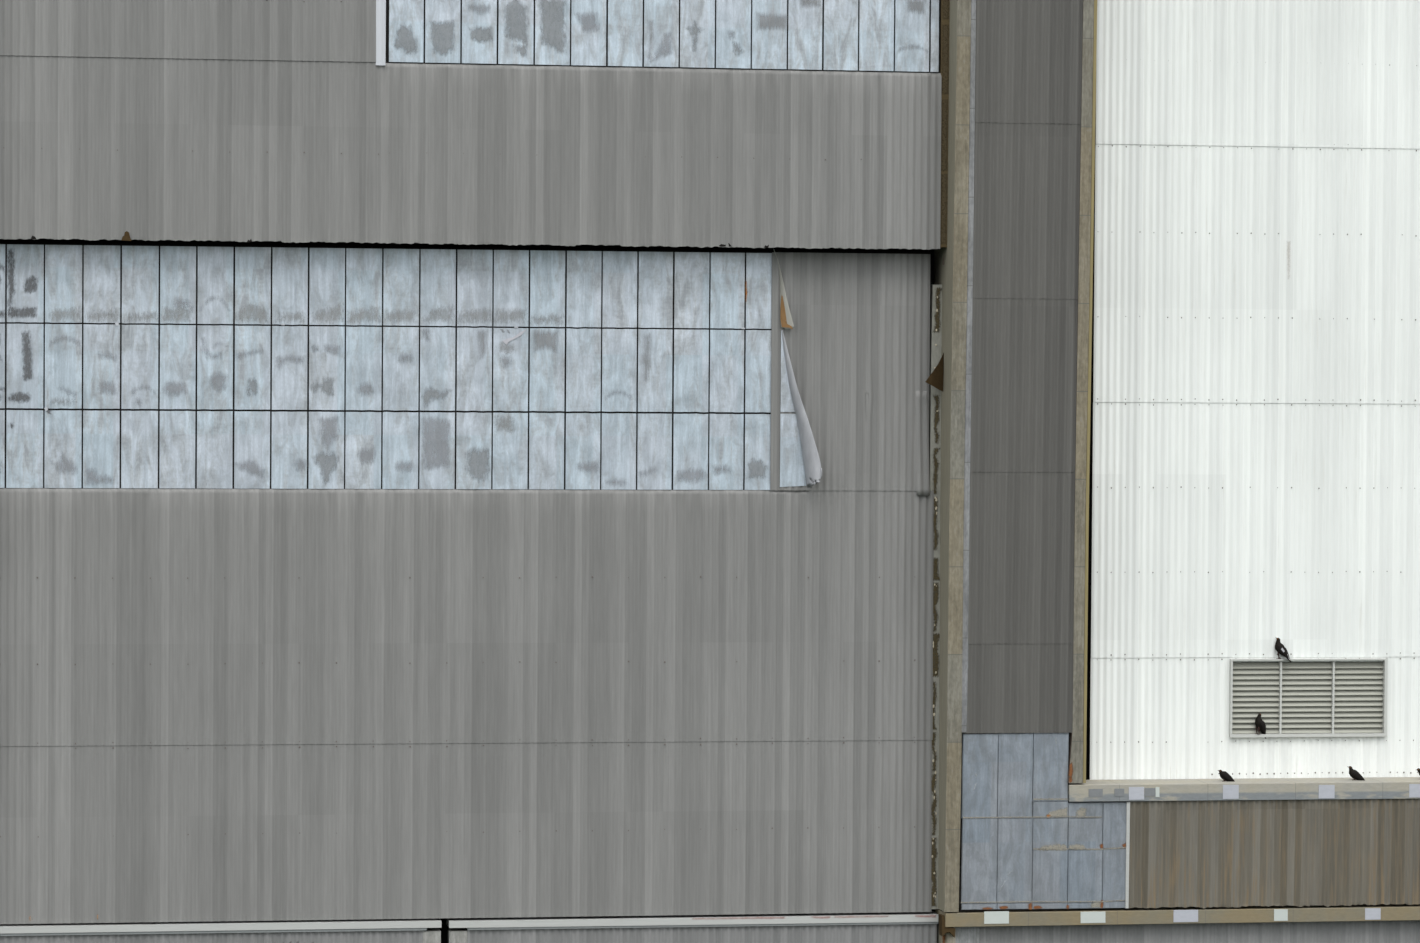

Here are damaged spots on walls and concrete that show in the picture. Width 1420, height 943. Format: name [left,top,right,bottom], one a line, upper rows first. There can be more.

peeling [774,250,822,487]